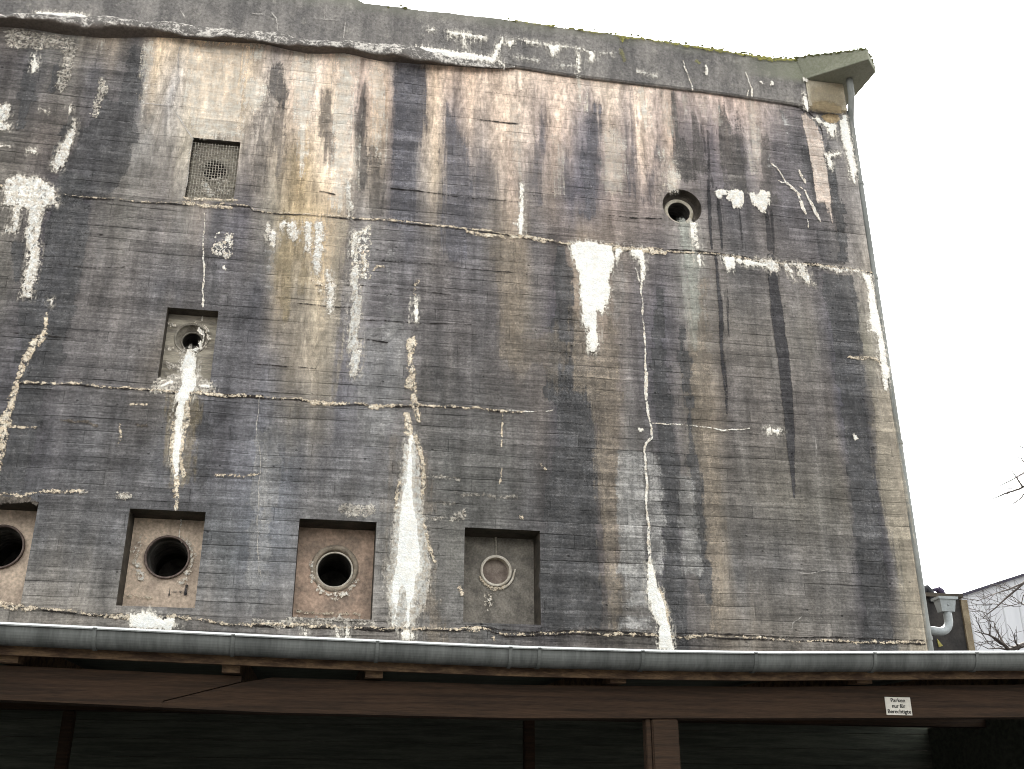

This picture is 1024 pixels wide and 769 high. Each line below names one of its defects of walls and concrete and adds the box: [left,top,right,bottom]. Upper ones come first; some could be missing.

water stain [0,39,153,494]
efflorescence [161,346,213,510]
water stain [183,41,428,379]
crack [55,46,573,321]
water stain [438,103,473,262]
crack [0,243,926,650]
water stain [539,239,646,633]
water stain [658,91,772,414]
crack [771,163,821,228]
water stain [755,92,899,651]